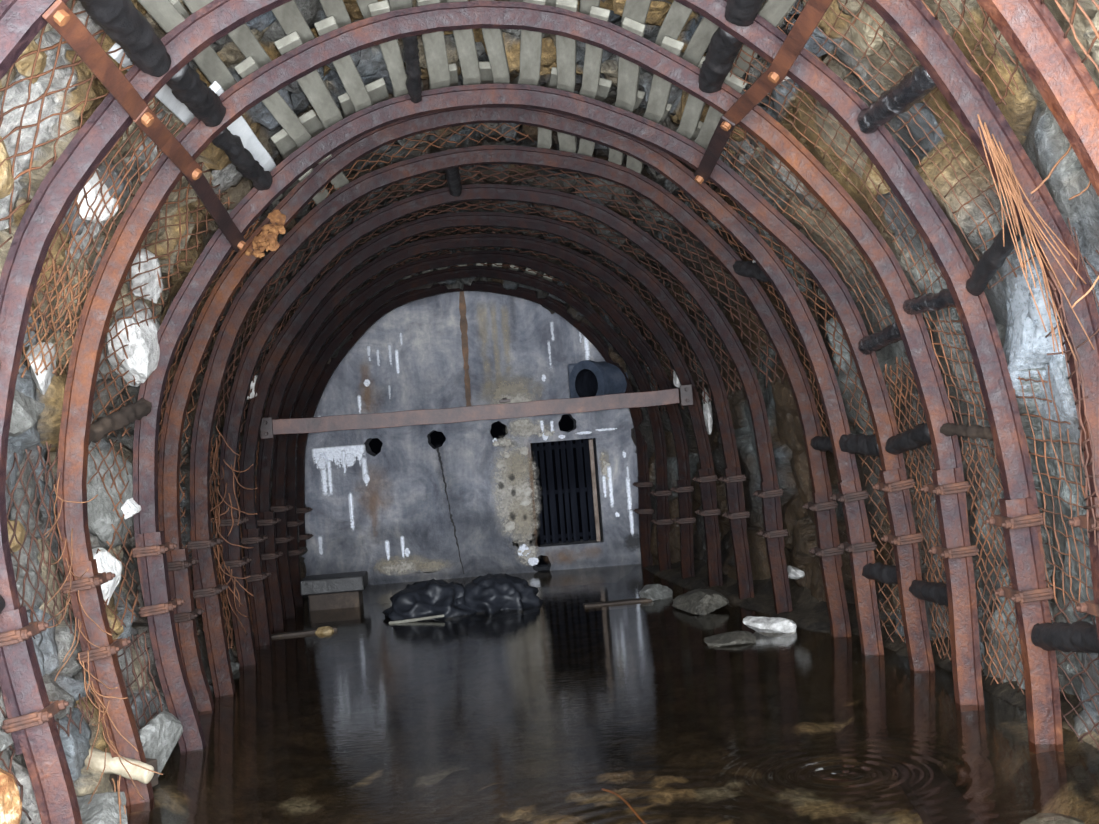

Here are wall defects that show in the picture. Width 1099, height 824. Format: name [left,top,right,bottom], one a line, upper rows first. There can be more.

efflorescence [312,445,370,495]
spalling [492,419,555,566]